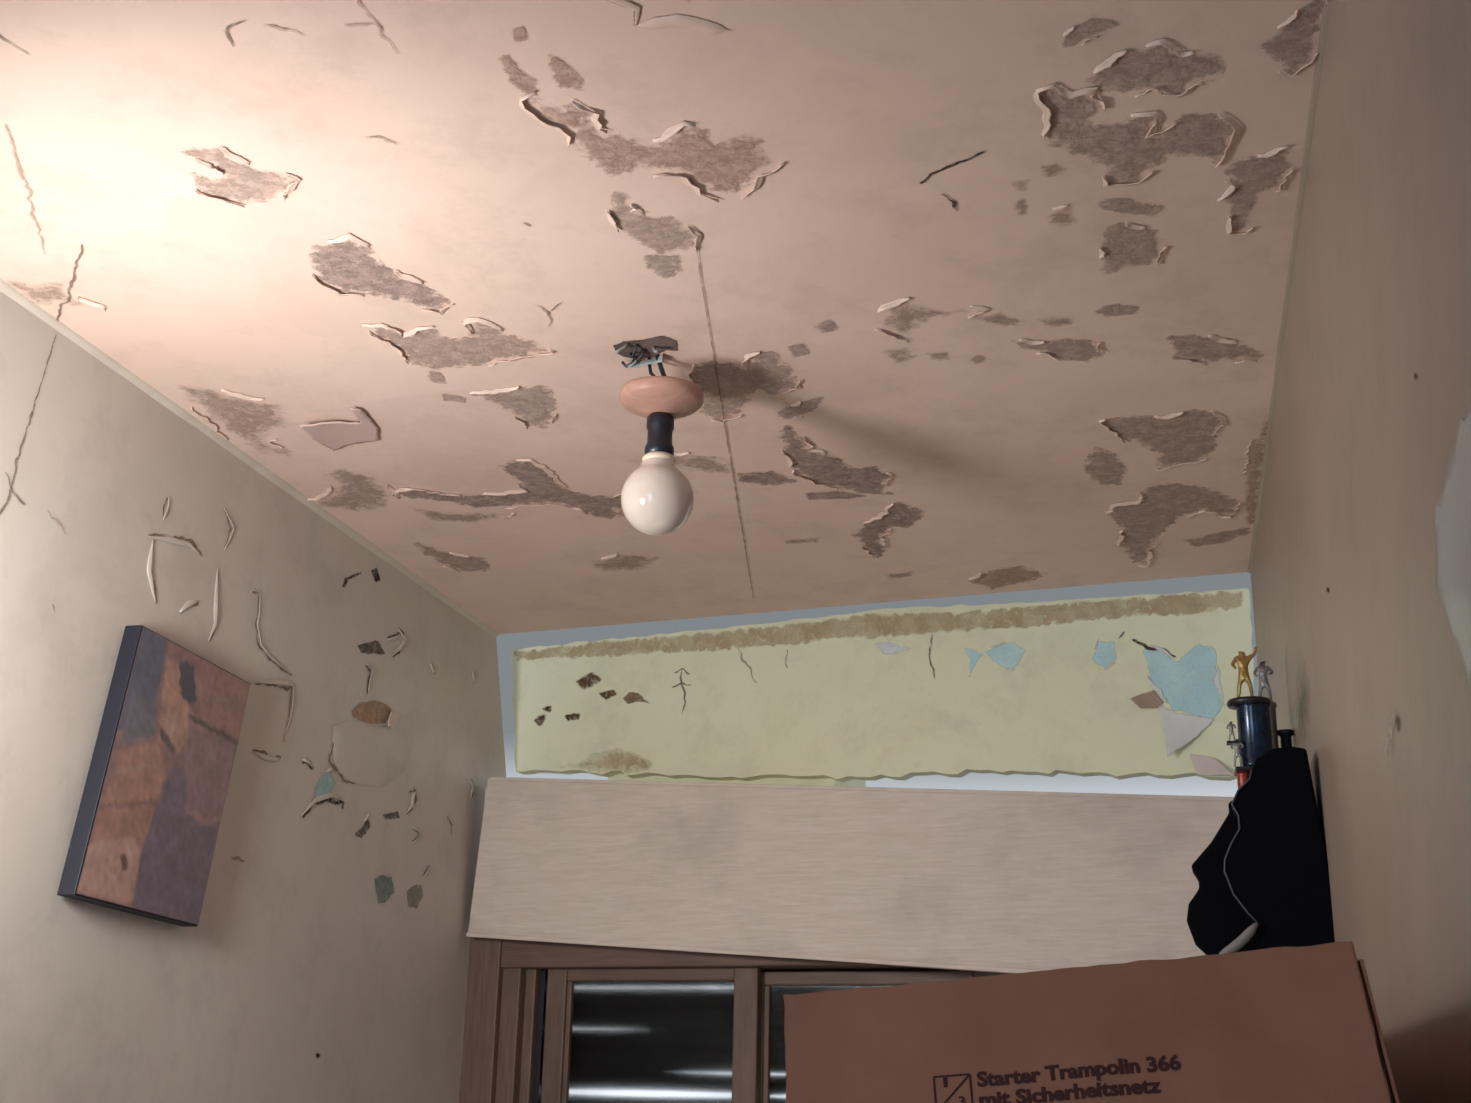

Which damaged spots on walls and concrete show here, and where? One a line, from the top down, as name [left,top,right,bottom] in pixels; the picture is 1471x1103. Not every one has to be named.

peeling [181,146,302,208]
crack [345,0,398,54]
peeling [500,27,783,203]
peeling [1033,38,1293,273]
crack [0,126,83,532]
peeling [311,233,557,429]
peeling [307,459,622,522]
peeling [674,344,921,559]
damp [514,591,1242,660]
peeling [1084,410,1267,568]
peeling [1130,644,1224,719]
peeling [1432,411,1471,688]